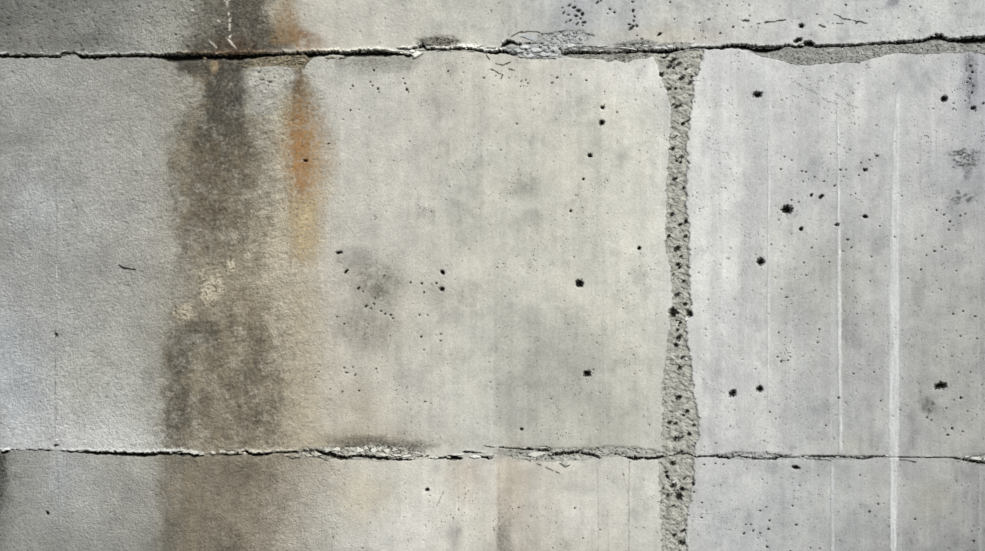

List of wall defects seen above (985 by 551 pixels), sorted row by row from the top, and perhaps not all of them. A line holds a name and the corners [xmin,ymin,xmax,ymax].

water stain [167,0,277,278]
rust [273,11,321,260]
crack [0,14,985,79]
spalling [500,1,785,551]
water stain [160,287,295,551]
crack [0,439,985,473]